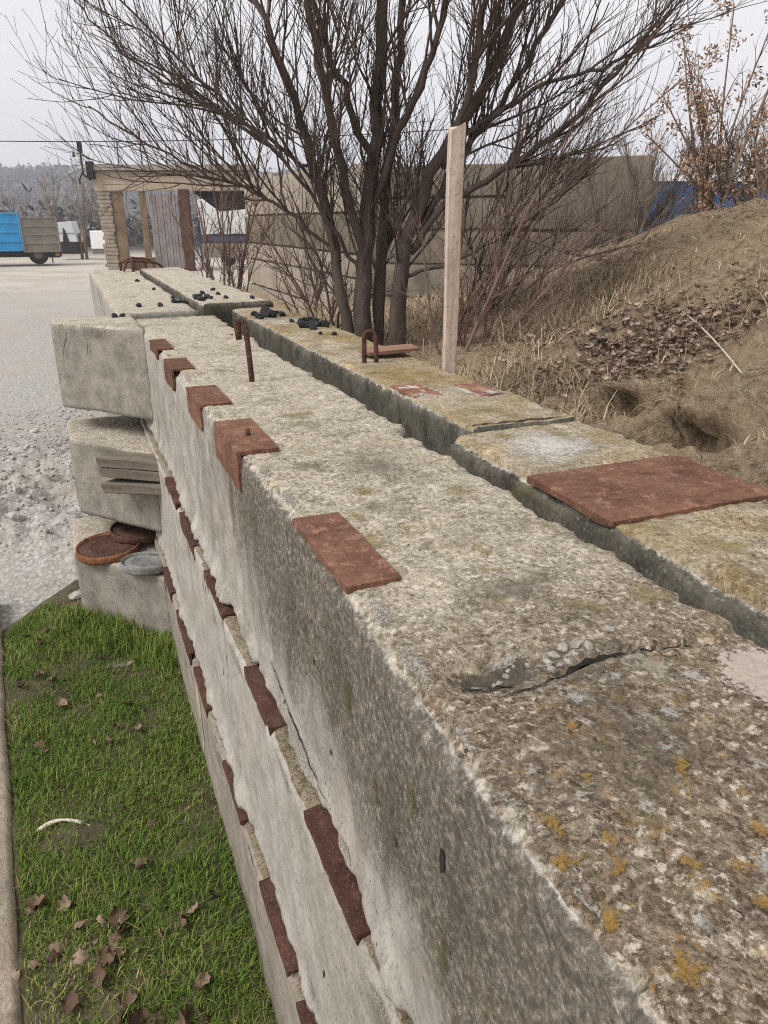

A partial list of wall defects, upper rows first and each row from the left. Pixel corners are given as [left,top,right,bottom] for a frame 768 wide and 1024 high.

spalling [396,647,542,692]
crack [461,644,710,699]